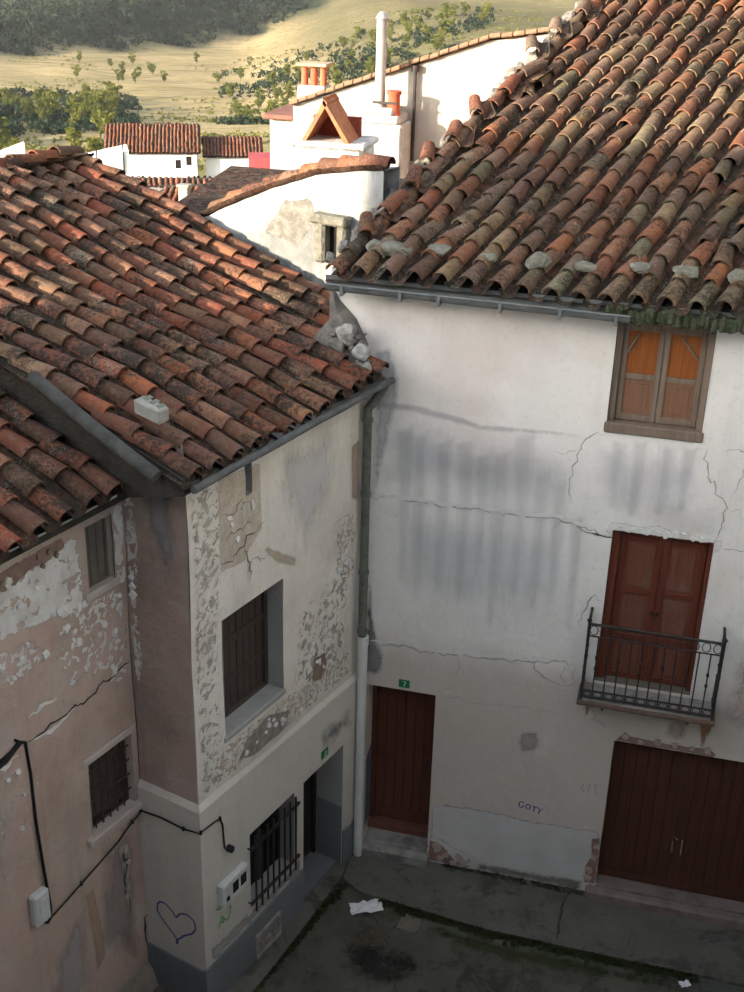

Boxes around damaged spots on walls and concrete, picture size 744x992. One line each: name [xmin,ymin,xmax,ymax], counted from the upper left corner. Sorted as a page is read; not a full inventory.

peeling [0,498,142,706]
crack [27,661,130,743]
crack [221,520,293,581]
spalling [193,464,356,792]
crack [371,640,575,688]
crack [373,432,615,539]
crack [703,449,744,552]
spalling [429,836,477,867]